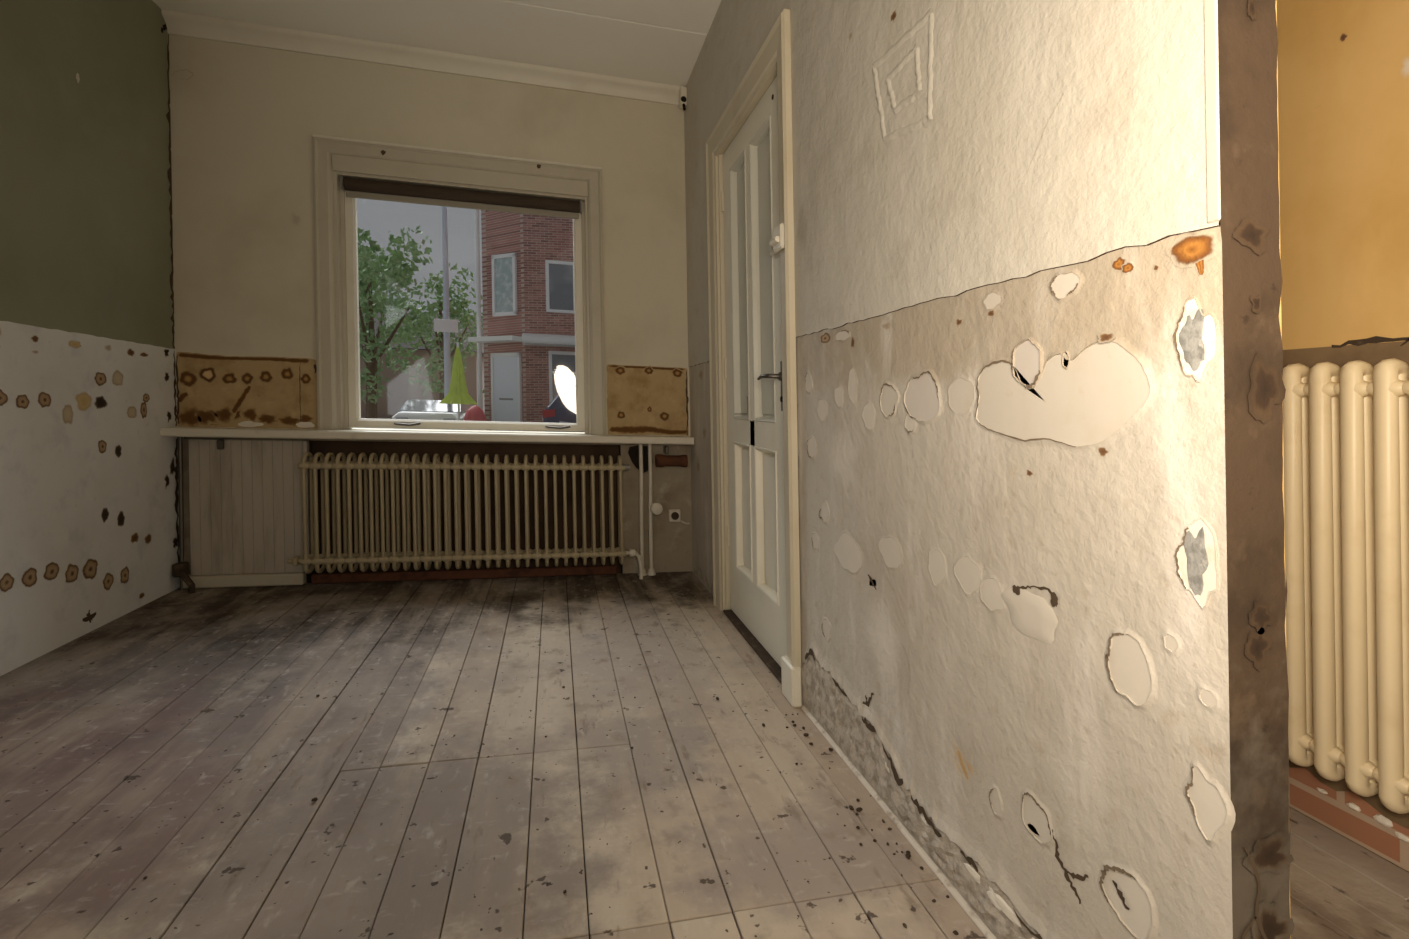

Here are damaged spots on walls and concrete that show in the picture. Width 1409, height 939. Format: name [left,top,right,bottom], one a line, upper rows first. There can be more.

corrosion [1165,231,1221,275]
spalling [1173,294,1221,384]
spalling [1174,516,1221,610]
spalling [802,637,1073,939]